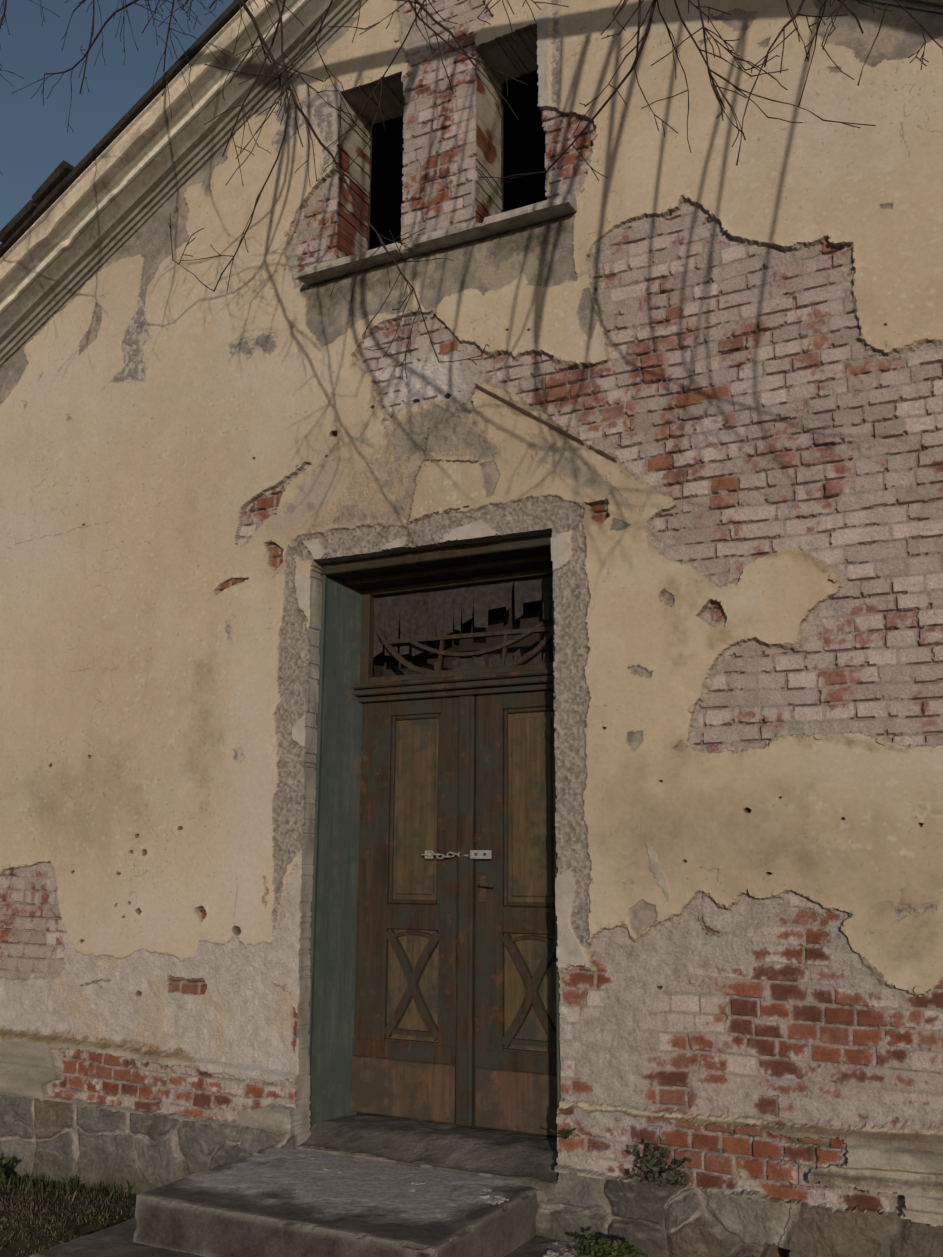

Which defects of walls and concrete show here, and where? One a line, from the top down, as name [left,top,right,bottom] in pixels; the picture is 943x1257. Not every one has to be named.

peeling [0,133,236,411]
crack [404,419,478,547]
flaking render [227,0,943,755]
flaking render [0,848,302,1082]
flaking render [555,842,943,1218]